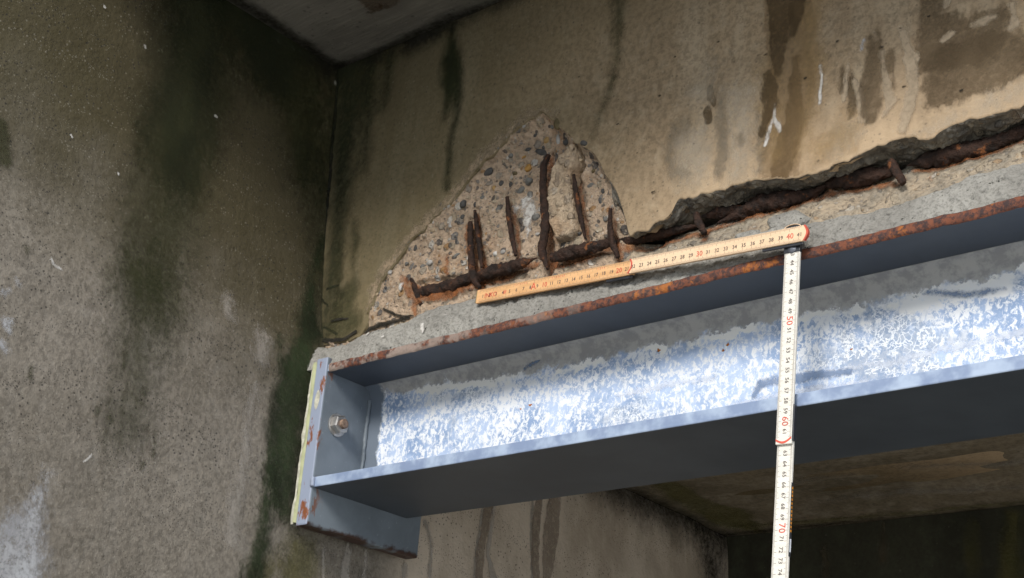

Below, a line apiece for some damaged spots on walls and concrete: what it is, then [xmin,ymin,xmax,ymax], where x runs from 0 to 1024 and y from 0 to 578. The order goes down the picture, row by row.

damp [442,26,460,188]
damp [703,84,716,124]
damp [758,0,805,178]
damp [839,0,1024,132]
spalling [325,106,629,348]
corrosion [403,207,770,316]
damp [240,464,278,578]